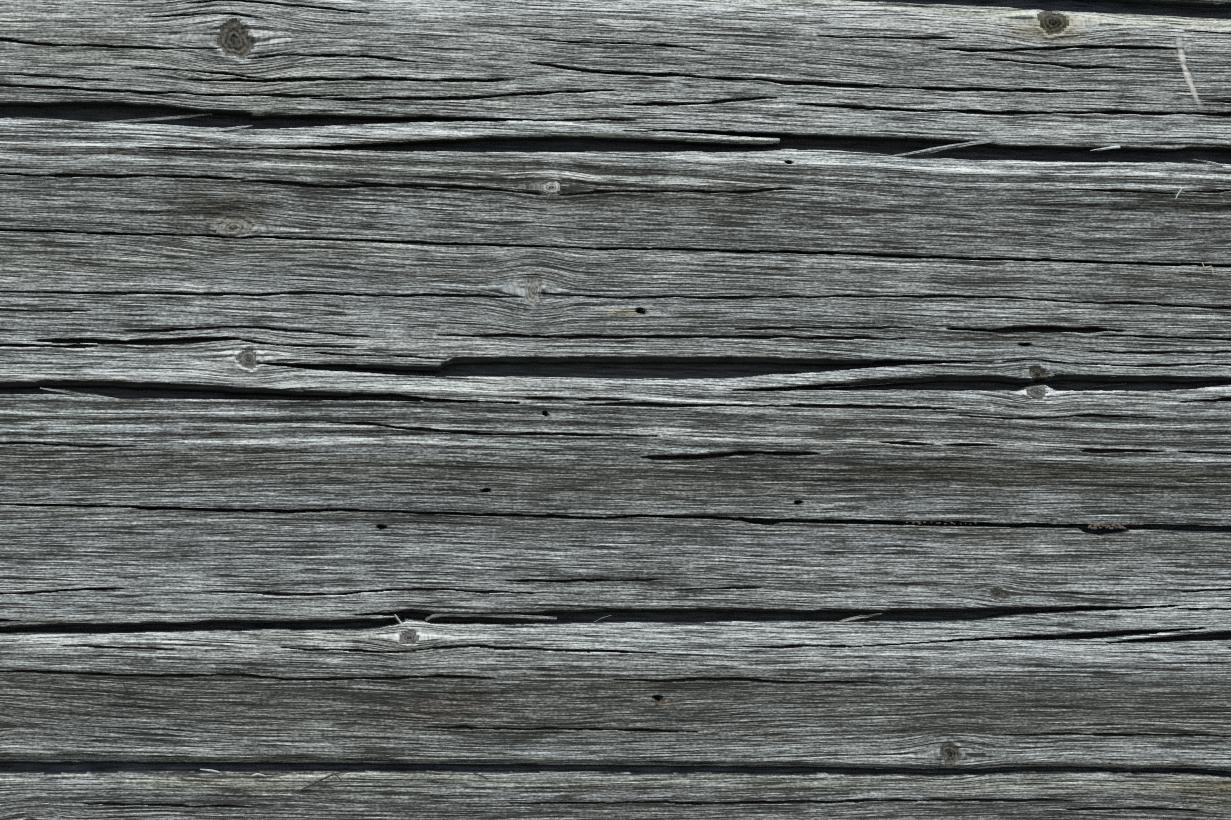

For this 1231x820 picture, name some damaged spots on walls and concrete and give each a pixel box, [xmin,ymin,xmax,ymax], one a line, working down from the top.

crack [328,397,1155,460]
crack [1081,448,1231,456]